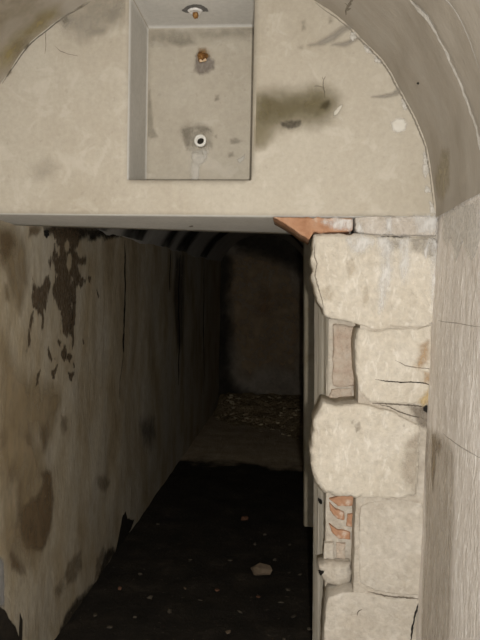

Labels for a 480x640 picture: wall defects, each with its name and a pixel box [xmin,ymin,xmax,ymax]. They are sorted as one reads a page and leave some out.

corrosion [196,49,213,73]
damp [256,91,331,134]
peeling [28,227,91,381]
crack [375,360,429,385]
crack [373,403,423,417]
crack [371,592,418,640]